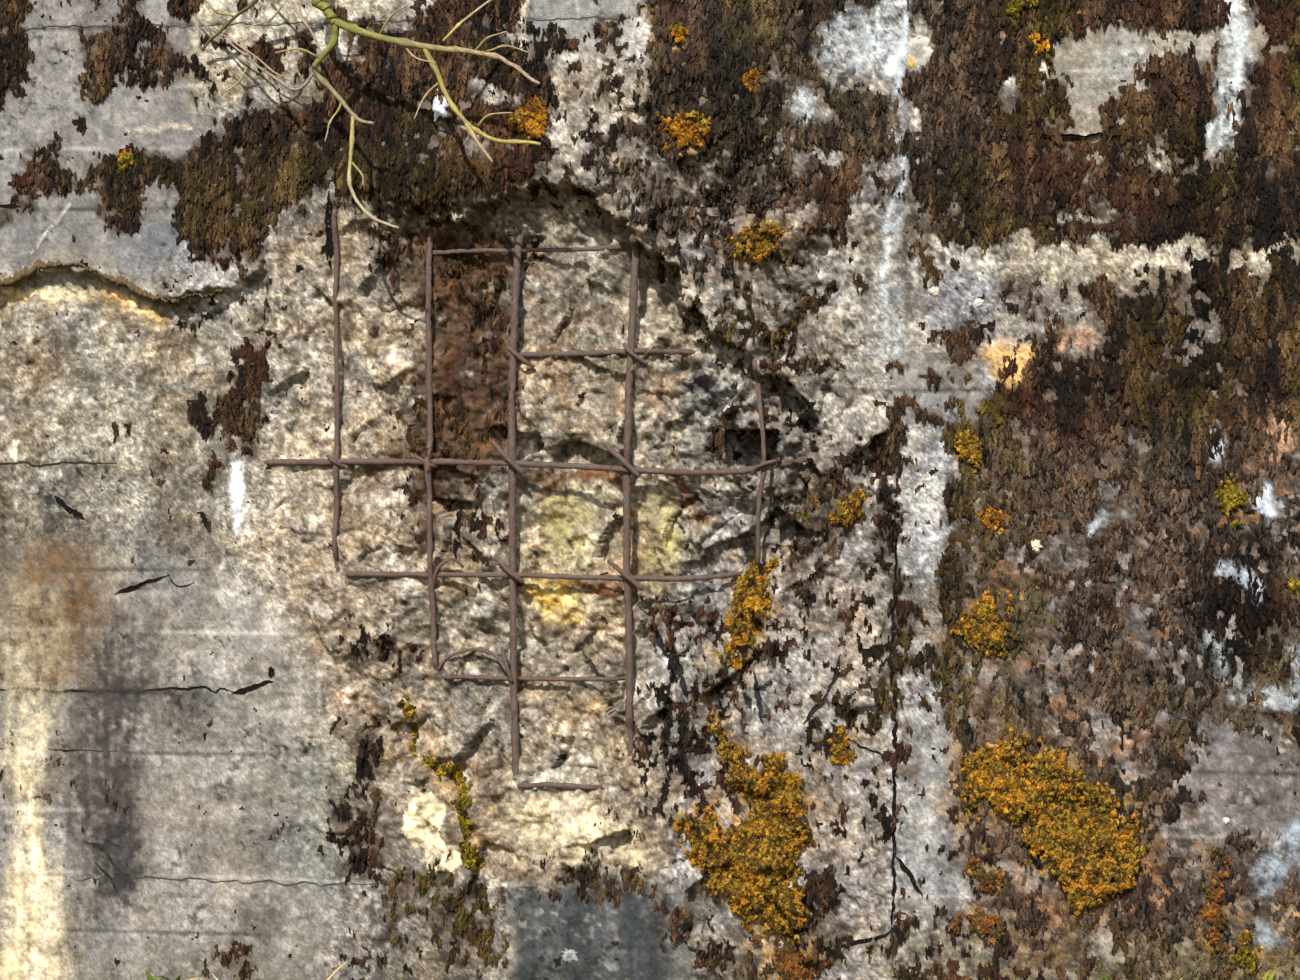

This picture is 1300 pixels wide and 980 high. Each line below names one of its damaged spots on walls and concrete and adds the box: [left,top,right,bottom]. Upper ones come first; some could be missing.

water stain [826,0,909,93]
water stain [798,90,812,123]
water stain [879,130,906,357]
corrosion [417,231,519,553]
corrosion [532,464,623,485]
spalling [0,184,822,899]
corrosion [548,580,620,597]
crack [0,686,110,694]
crack [0,746,112,754]
water stain [0,552,161,980]
crack [145,666,275,695]
crack [803,450,923,979]